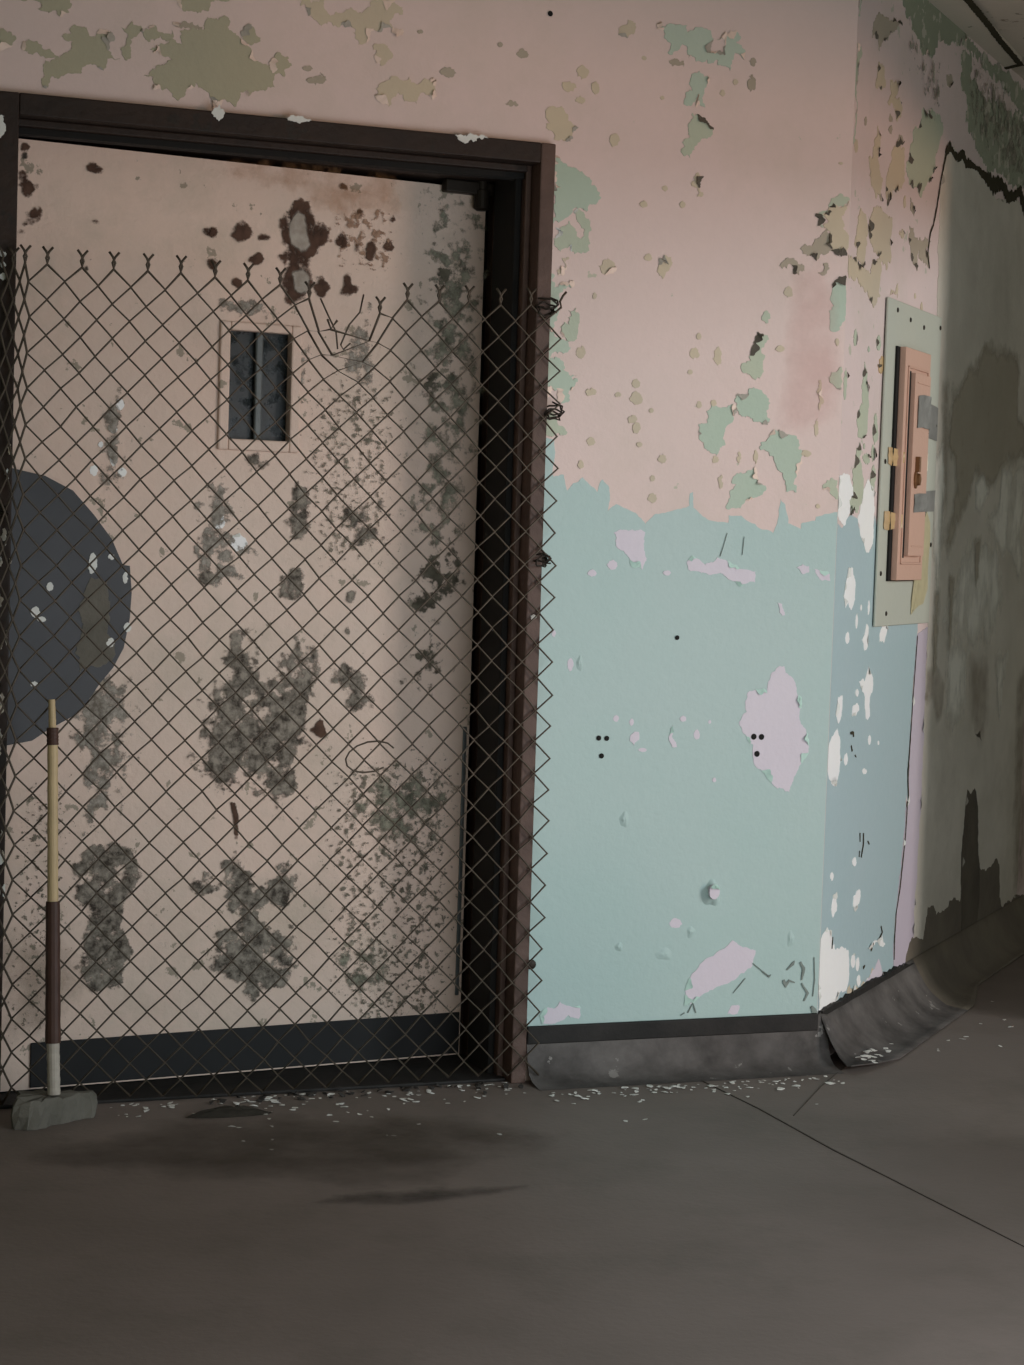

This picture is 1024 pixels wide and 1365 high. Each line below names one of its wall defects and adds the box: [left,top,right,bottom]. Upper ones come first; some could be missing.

peeling [0,0,326,108]
peeling [657,22,757,157]
crack [927,141,1024,269]
peeling [696,310,811,510]
flaking render [780,0,1024,1010]
leakage [934,345,1024,725]
peeling [739,666,809,792]
leakage [230,802,239,839]
leakage [353,763,459,885]
mould [340,949,387,1017]
peeling [540,1002,581,1024]
crack [701,1066,1024,1247]